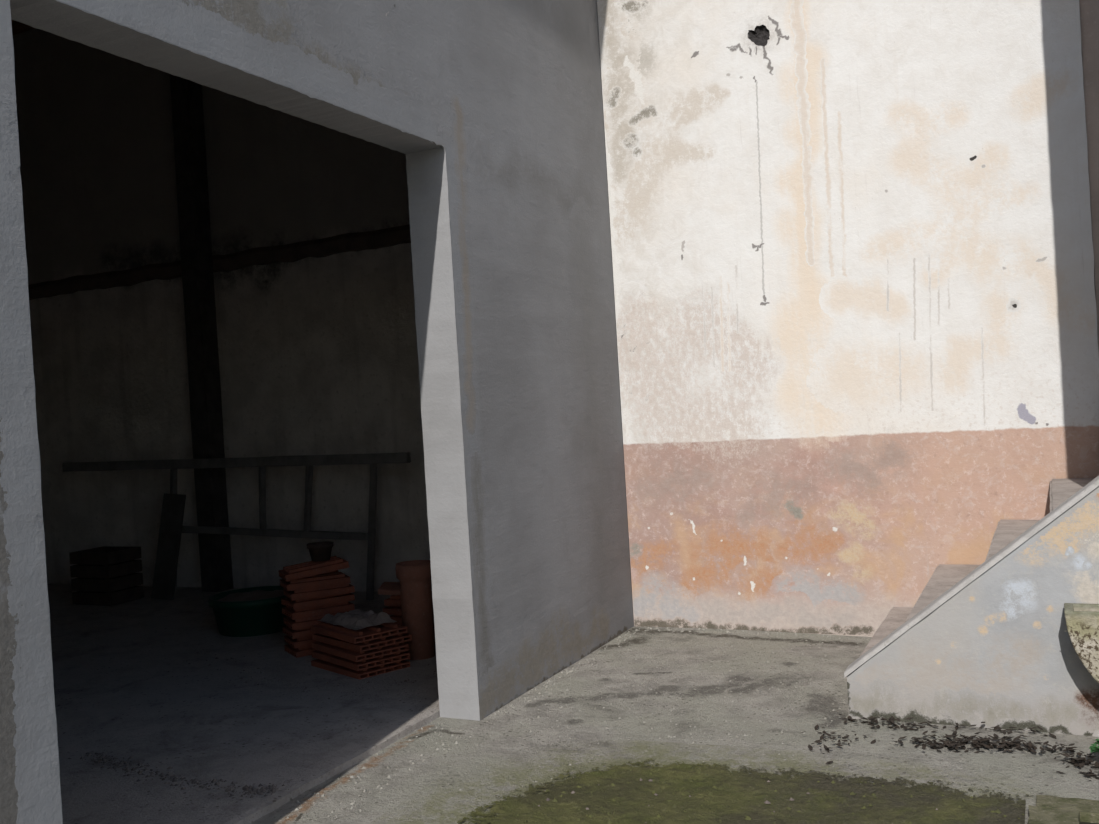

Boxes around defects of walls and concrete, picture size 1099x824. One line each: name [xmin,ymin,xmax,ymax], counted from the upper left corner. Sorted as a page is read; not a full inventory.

damp [617,0,662,82]
spalling [726,13,790,75]
peeling [597,0,757,323]
peeling [619,365,632,437]
damp [0,418,23,824]